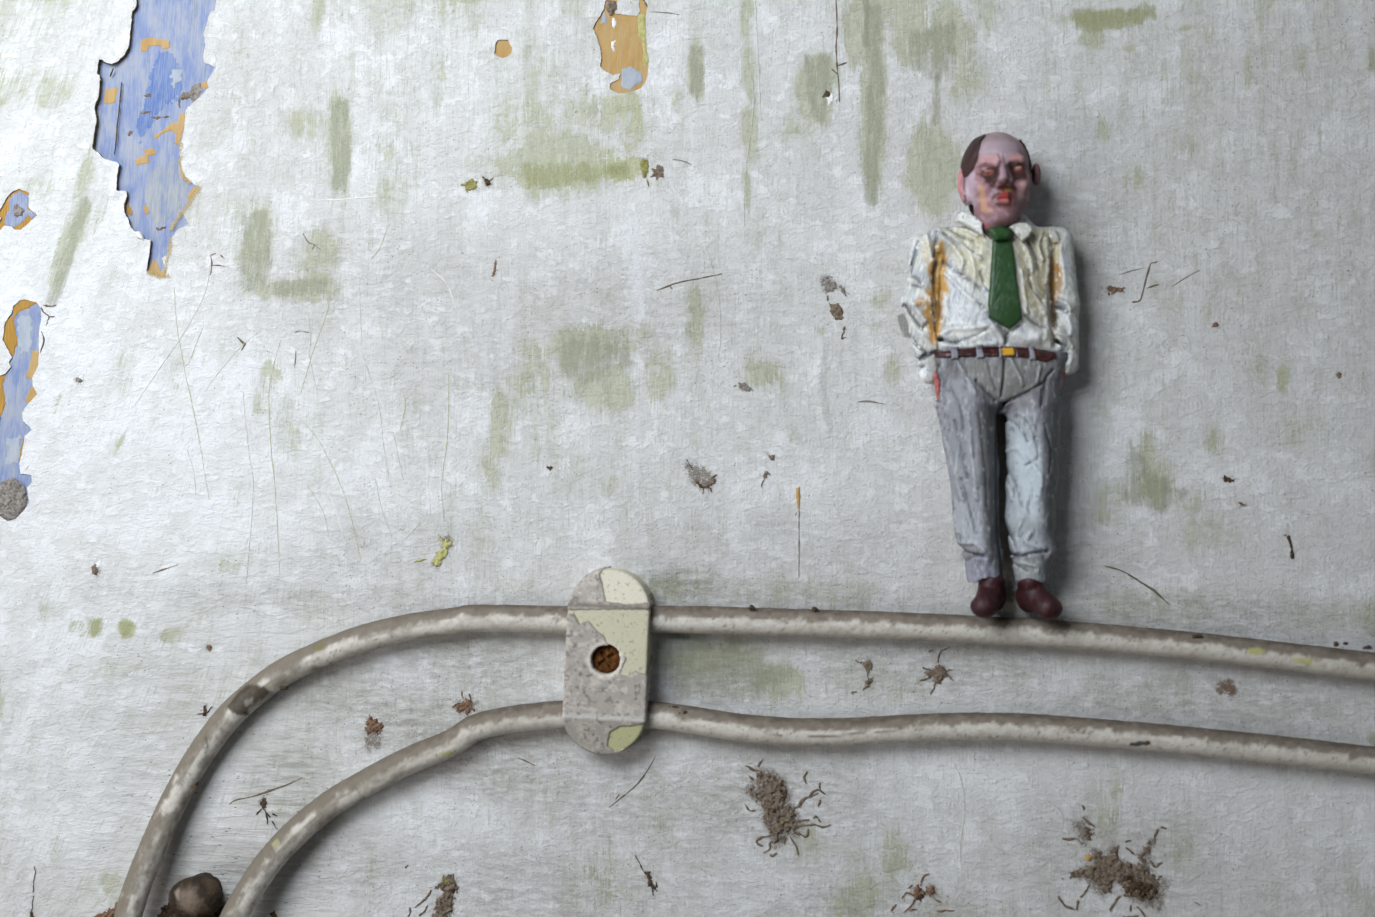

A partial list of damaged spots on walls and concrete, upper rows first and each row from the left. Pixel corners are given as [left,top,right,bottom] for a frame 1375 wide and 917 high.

peeling [0,189,37,230]
peeling [94,0,216,279]
peeling [593,0,679,93]
peeling [0,299,56,521]